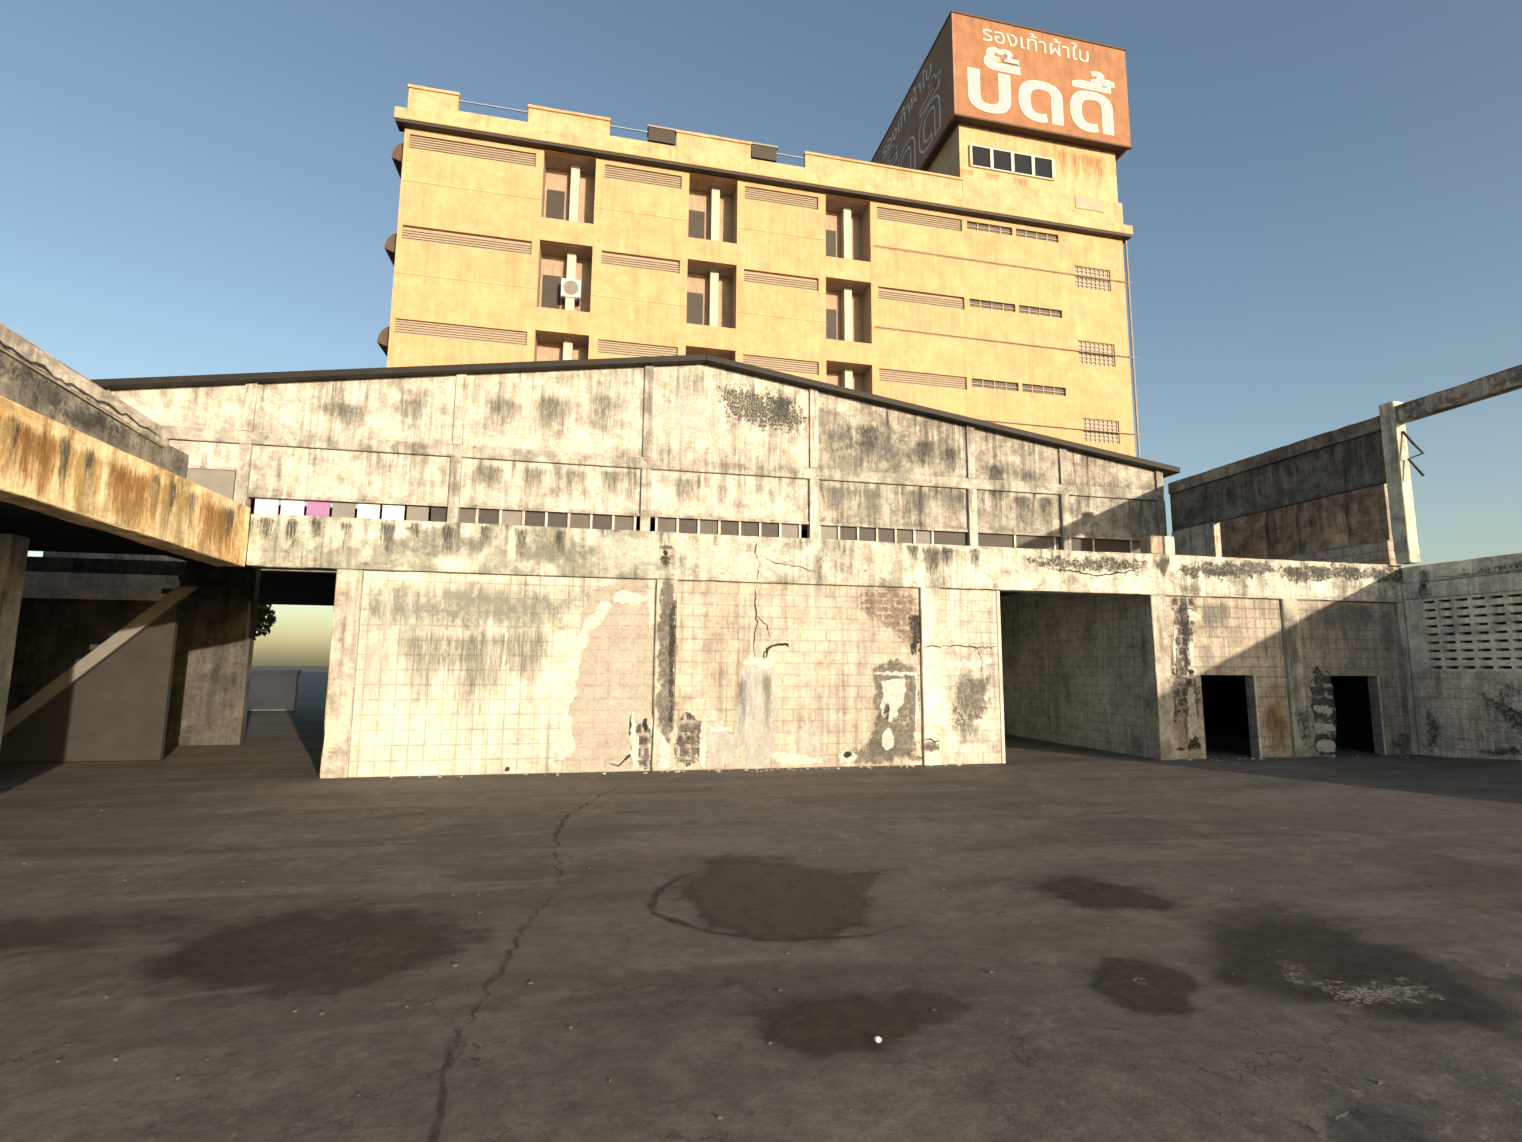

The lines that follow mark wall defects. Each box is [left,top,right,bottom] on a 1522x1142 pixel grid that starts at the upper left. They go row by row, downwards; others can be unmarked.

leakage [716,383,807,435]
rust [0,417,241,550]
leakage [366,583,569,693]
peeling [555,535,671,773]
peeling [699,715,739,768]
peeling [771,751,823,765]
spalling [861,587,940,753]
peeling [1173,609,1201,750]
peeling [1309,666,1337,757]
leakage [648,856,906,942]
leakage [1036,878,1173,909]
leakage [1208,906,1522,1030]